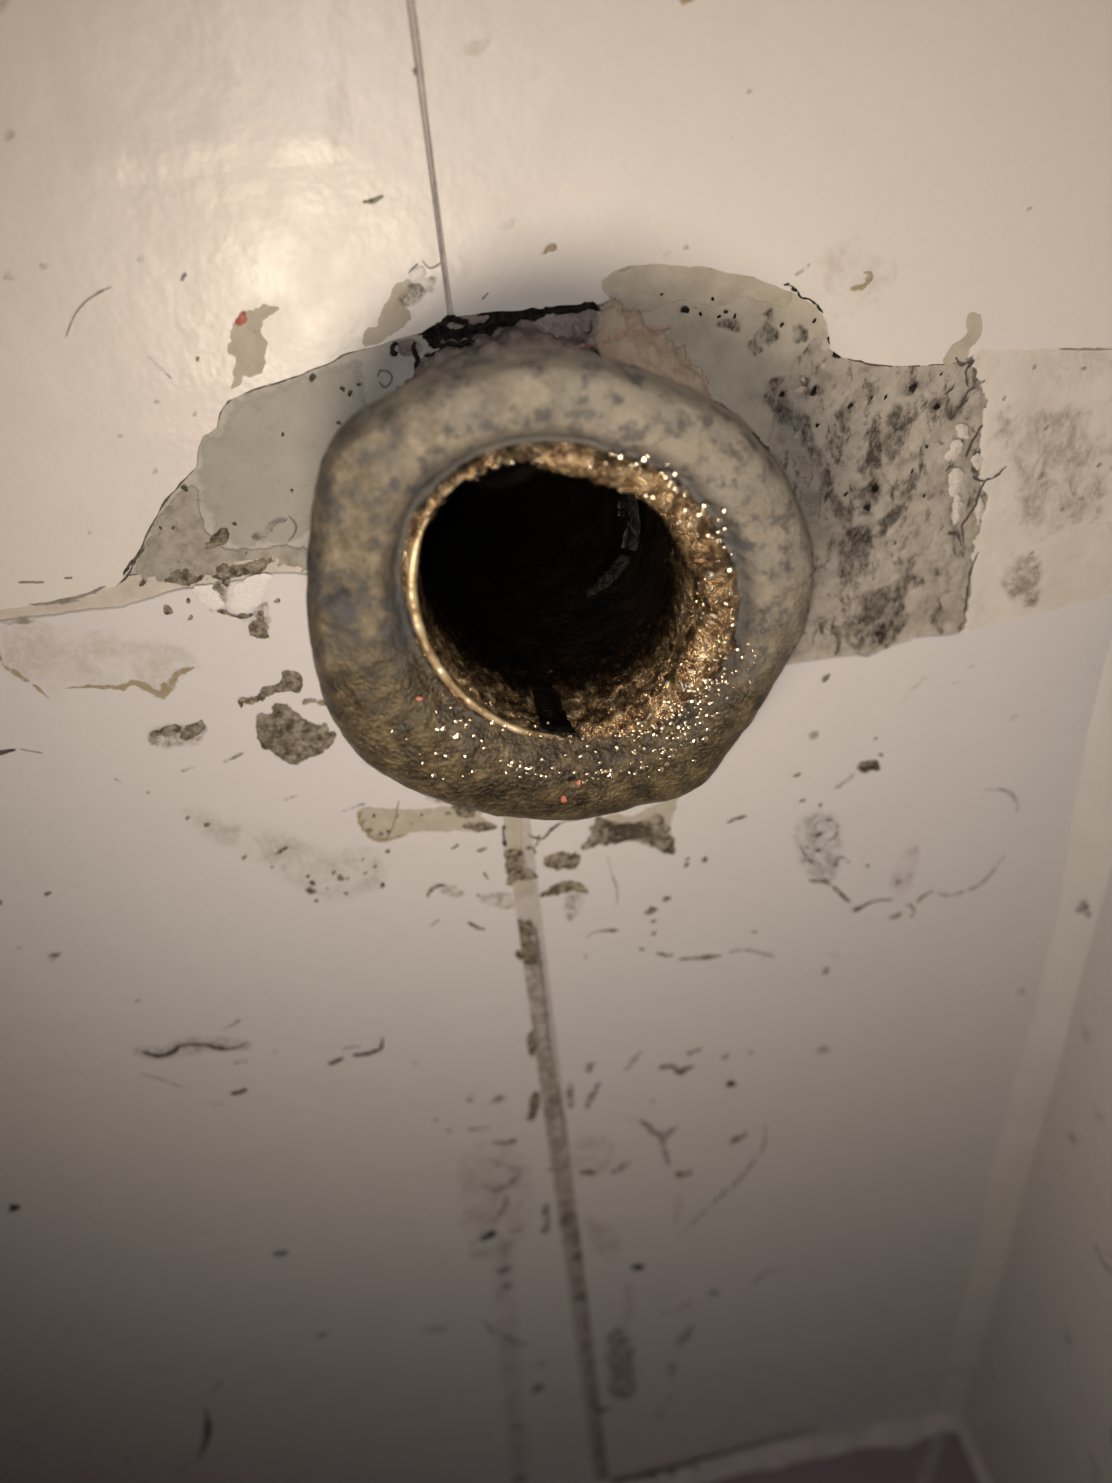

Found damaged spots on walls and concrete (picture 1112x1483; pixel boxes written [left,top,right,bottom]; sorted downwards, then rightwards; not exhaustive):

spalling [119,261,1006,663]
peeling [357,800,497,842]